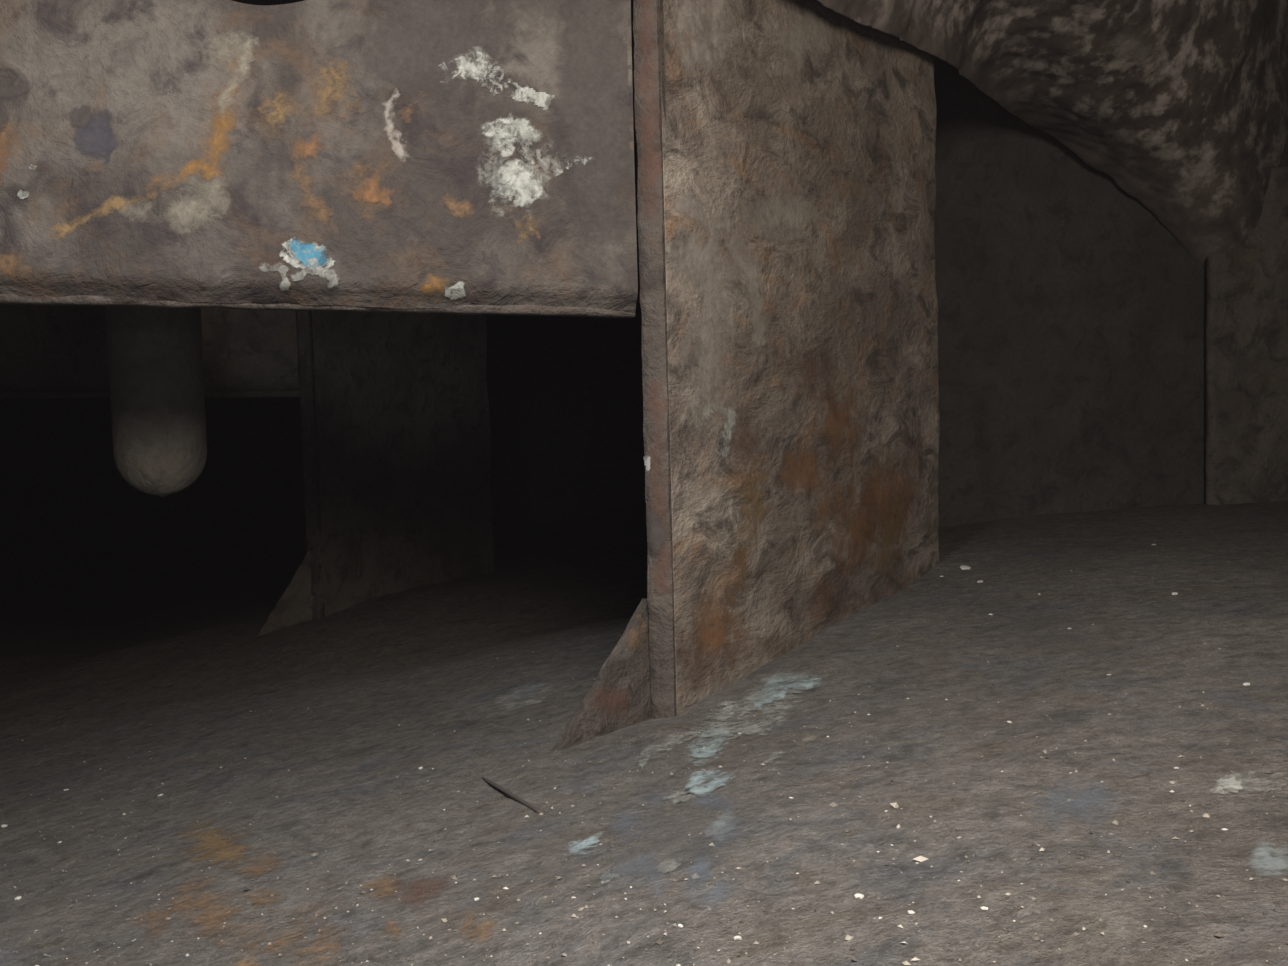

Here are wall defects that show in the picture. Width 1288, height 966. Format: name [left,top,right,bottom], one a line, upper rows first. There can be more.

rust [152,40,251,189]
damp [374,0,634,236]
peeling [261,239,338,291]
rust [647,510,666,554]